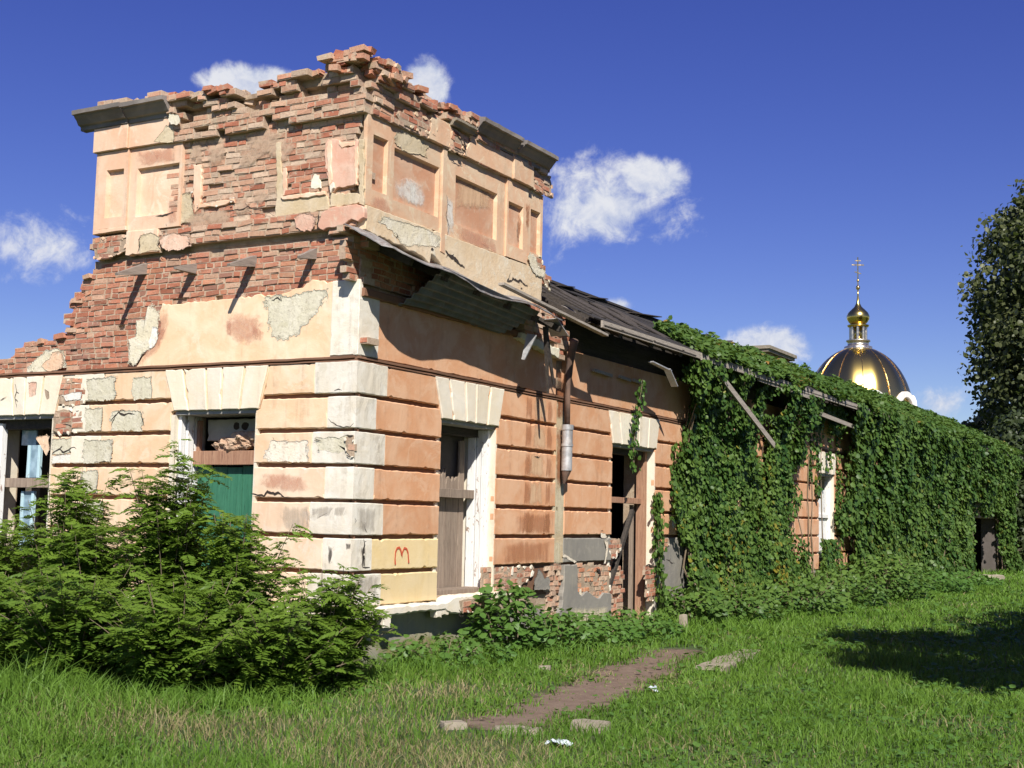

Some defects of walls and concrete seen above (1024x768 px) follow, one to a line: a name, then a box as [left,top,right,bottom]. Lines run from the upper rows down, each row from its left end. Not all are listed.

flaking render [394,107,438,157]
flaking render [378,216,441,247]
crack [431,195,465,268]
flaking render [0,63,380,520]
crack [251,490,288,498]
flaking render [459,565,534,613]
flaking render [563,532,622,598]